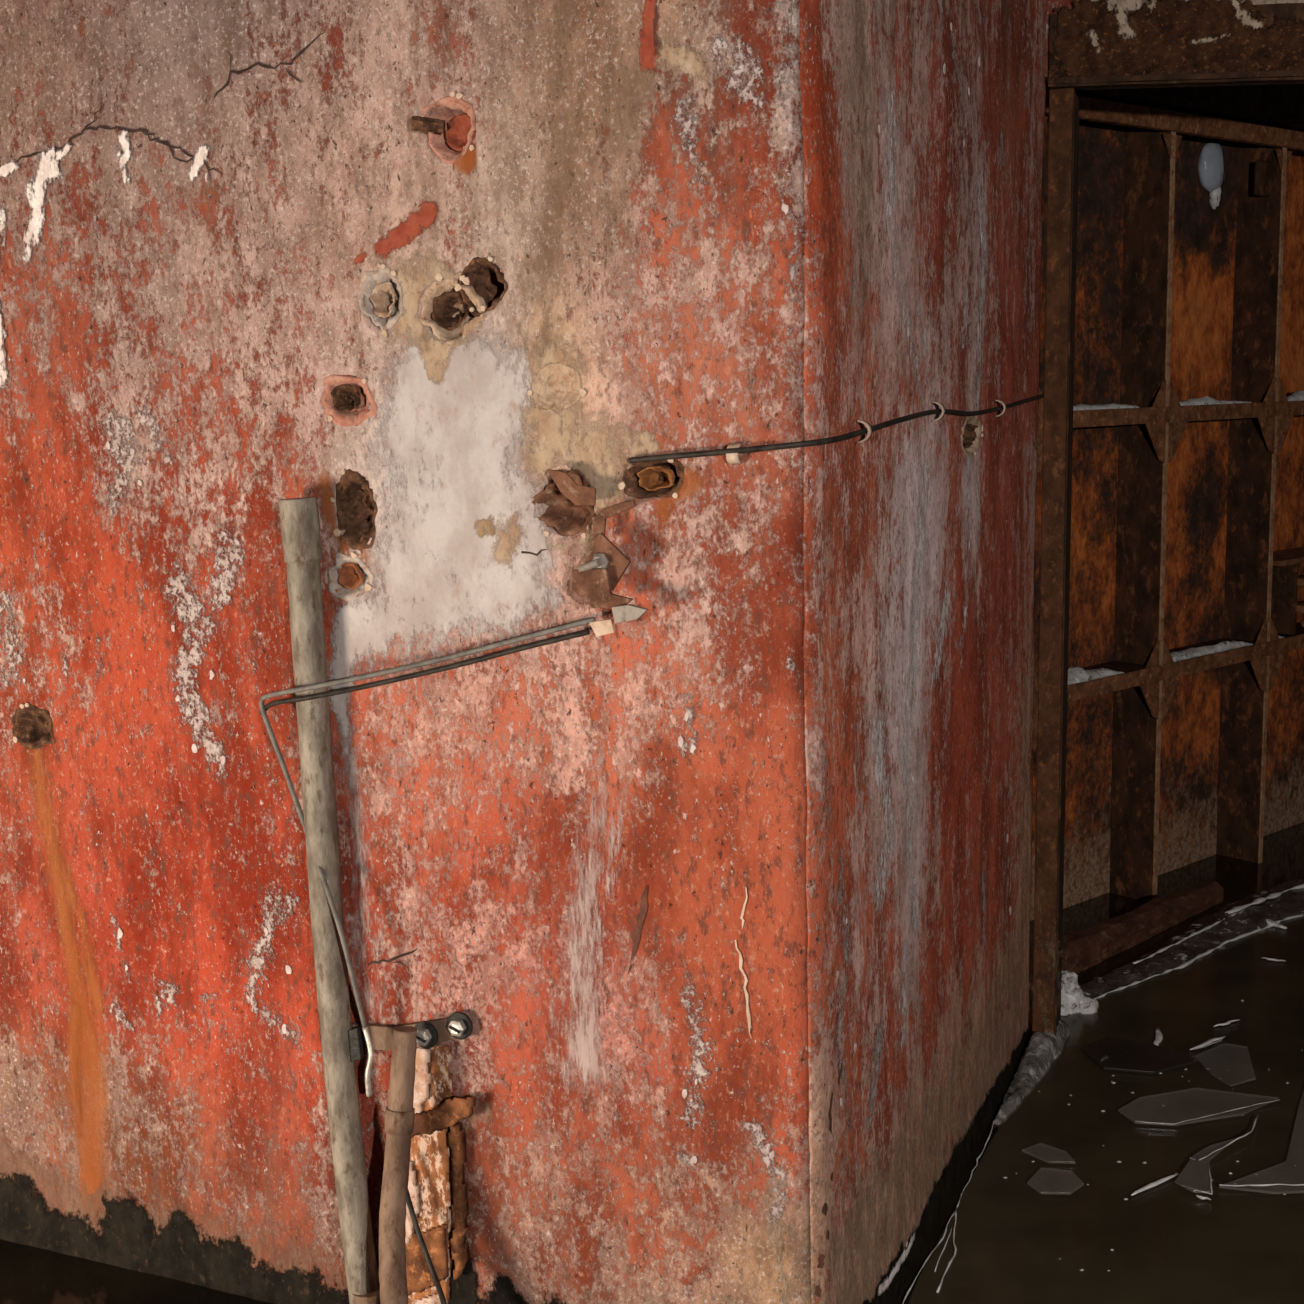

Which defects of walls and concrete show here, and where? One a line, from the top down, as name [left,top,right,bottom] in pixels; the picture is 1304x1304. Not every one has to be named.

crack [214,32,325,98]
peeling [1085,29,1101,53]
peeling [1114,3,1136,40]
peeling [1191,0,1264,44]
crack [0,103,224,178]
water stain [112,130,132,185]
water stain [188,145,215,183]
spalling [411,92,476,164]
water stain [0,142,72,265]
peeling [321,256,599,774]
water stain [0,1143,350,1304]
water stain [448,1228,527,1304]